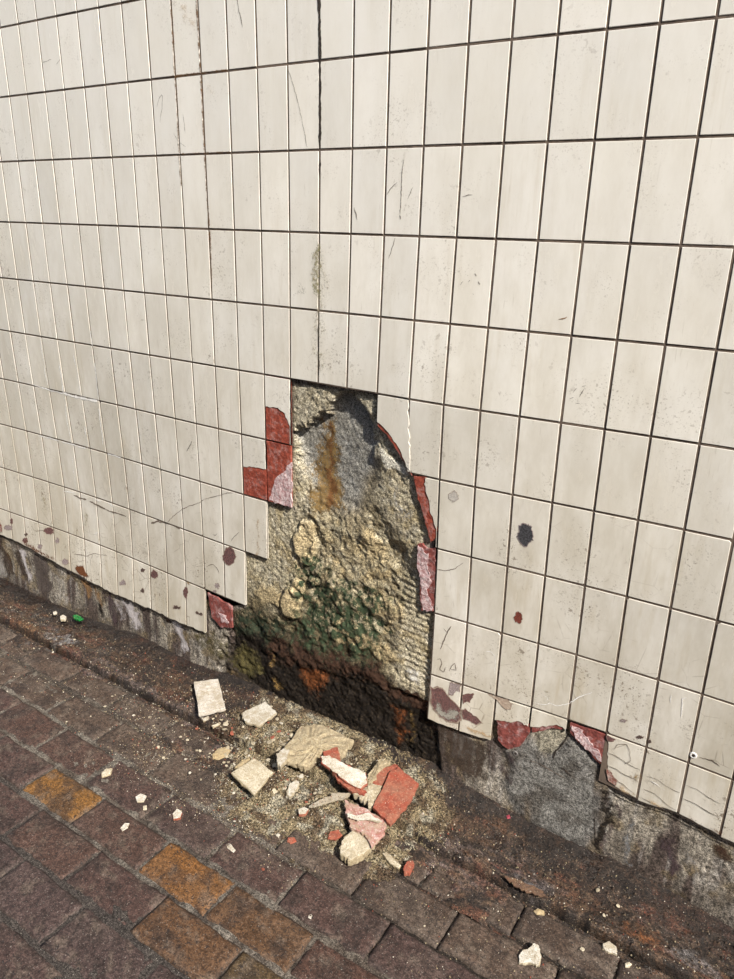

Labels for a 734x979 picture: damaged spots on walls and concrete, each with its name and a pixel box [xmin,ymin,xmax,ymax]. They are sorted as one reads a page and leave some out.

rust [308,418,346,519]
damp [0,540,54,597]
damp [98,590,142,630]
efflorescence [173,621,189,651]
spalling [195,375,483,765]
damp [234,627,491,779]
spalling [489,694,618,786]
damp [594,790,622,853]
crack [609,744,734,844]